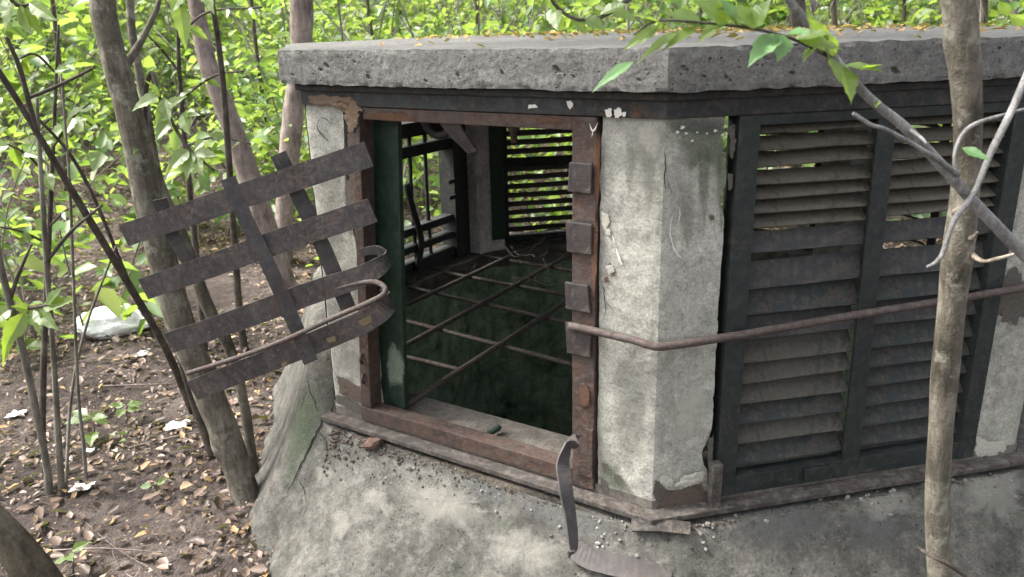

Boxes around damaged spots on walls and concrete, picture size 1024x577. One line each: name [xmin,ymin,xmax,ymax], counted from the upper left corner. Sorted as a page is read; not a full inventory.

spalling [307,94,363,147]
corrosion [368,113,414,121]
spalling [676,125,736,158]
spalling [345,173,355,205]
crack [286,377,334,503]
spalling [974,436,1007,458]
spalling [653,435,714,509]